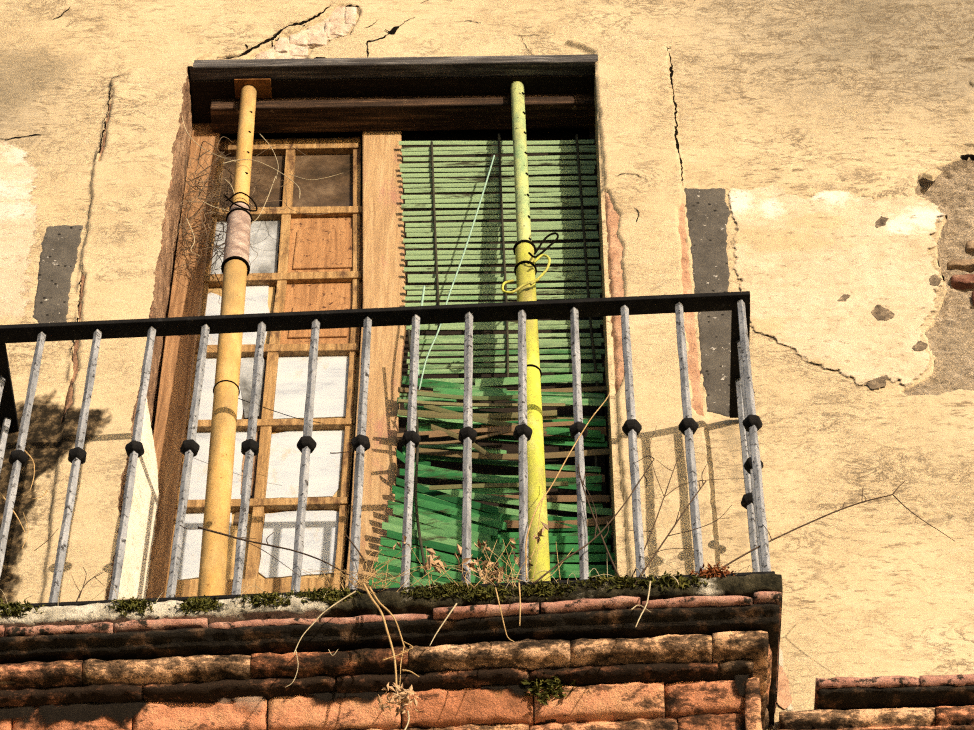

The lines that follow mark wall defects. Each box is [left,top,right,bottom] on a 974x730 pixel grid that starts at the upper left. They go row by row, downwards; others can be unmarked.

spalling [253,6,358,59]
crack [217,0,427,59]
crack [95,74,126,159]
crack [668,48,683,180]
peeling [729,160,974,396]